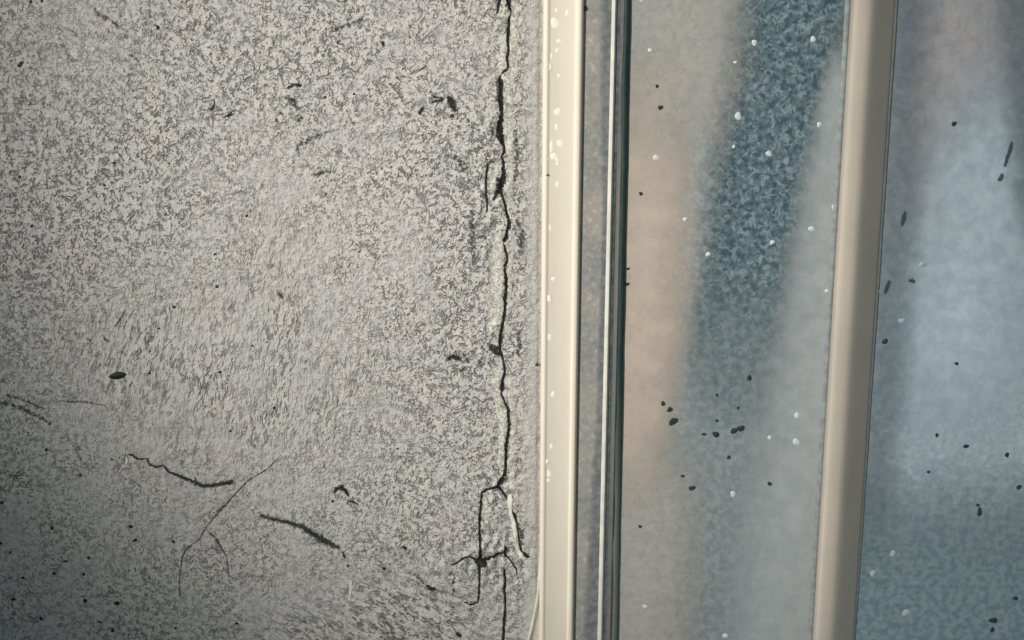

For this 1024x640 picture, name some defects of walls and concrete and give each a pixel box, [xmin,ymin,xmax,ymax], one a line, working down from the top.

crack [111,454,276,597]
crack [451,0,530,640]